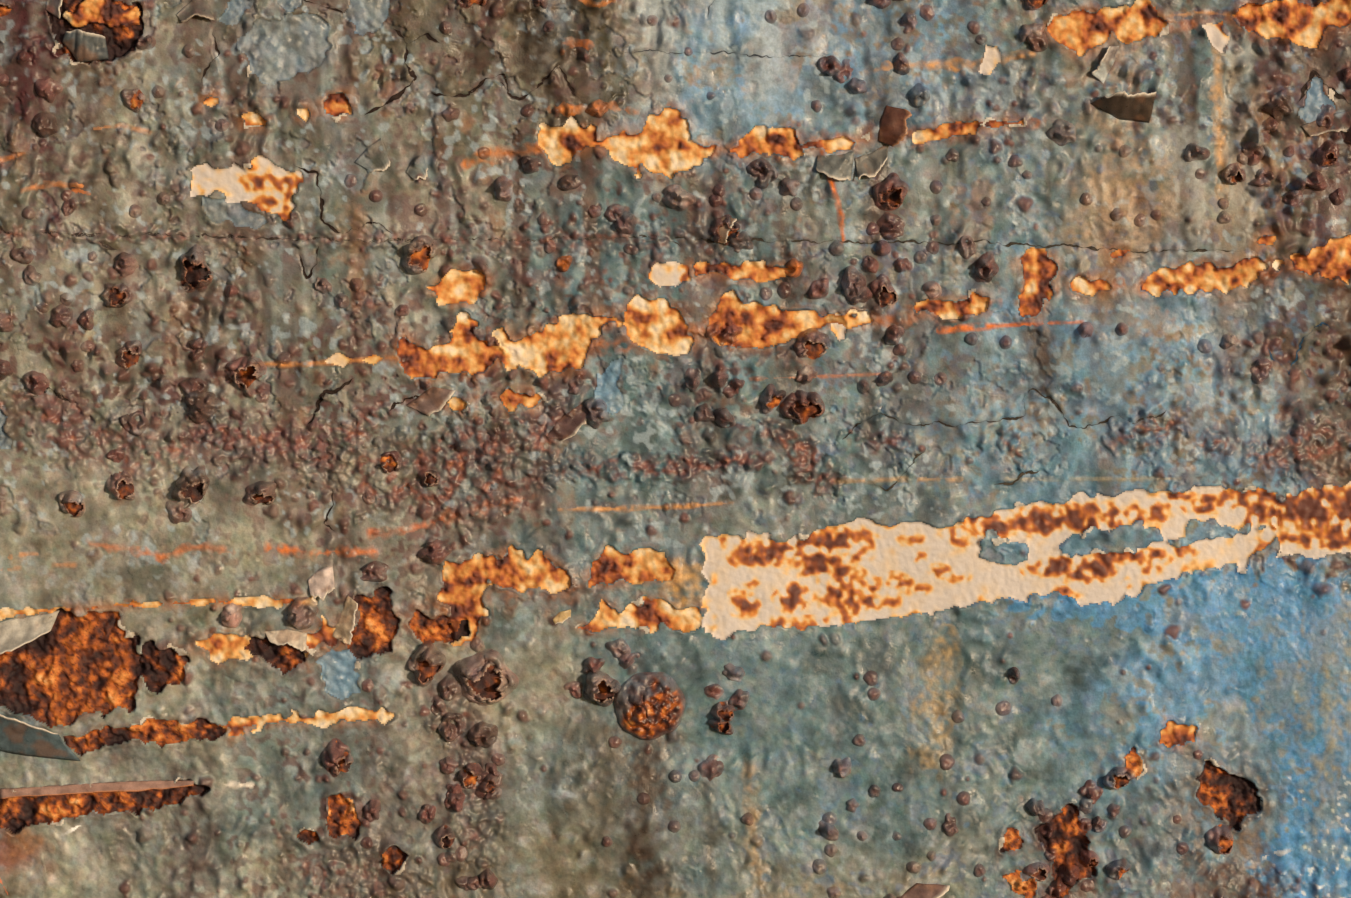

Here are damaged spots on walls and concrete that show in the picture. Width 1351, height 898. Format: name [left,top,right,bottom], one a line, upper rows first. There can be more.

spalling [41,0,149,71]
rust [452,140,546,175]
rust [0,214,714,267]
rust [1230,252,1296,296]
rust [164,573,451,681]
rust [481,564,592,627]
peeling [0,481,1351,761]
rust [657,547,708,610]
rust [1143,552,1351,898]
rust [0,824,55,898]
spalling [0,777,210,834]
rust [992,770,1137,898]